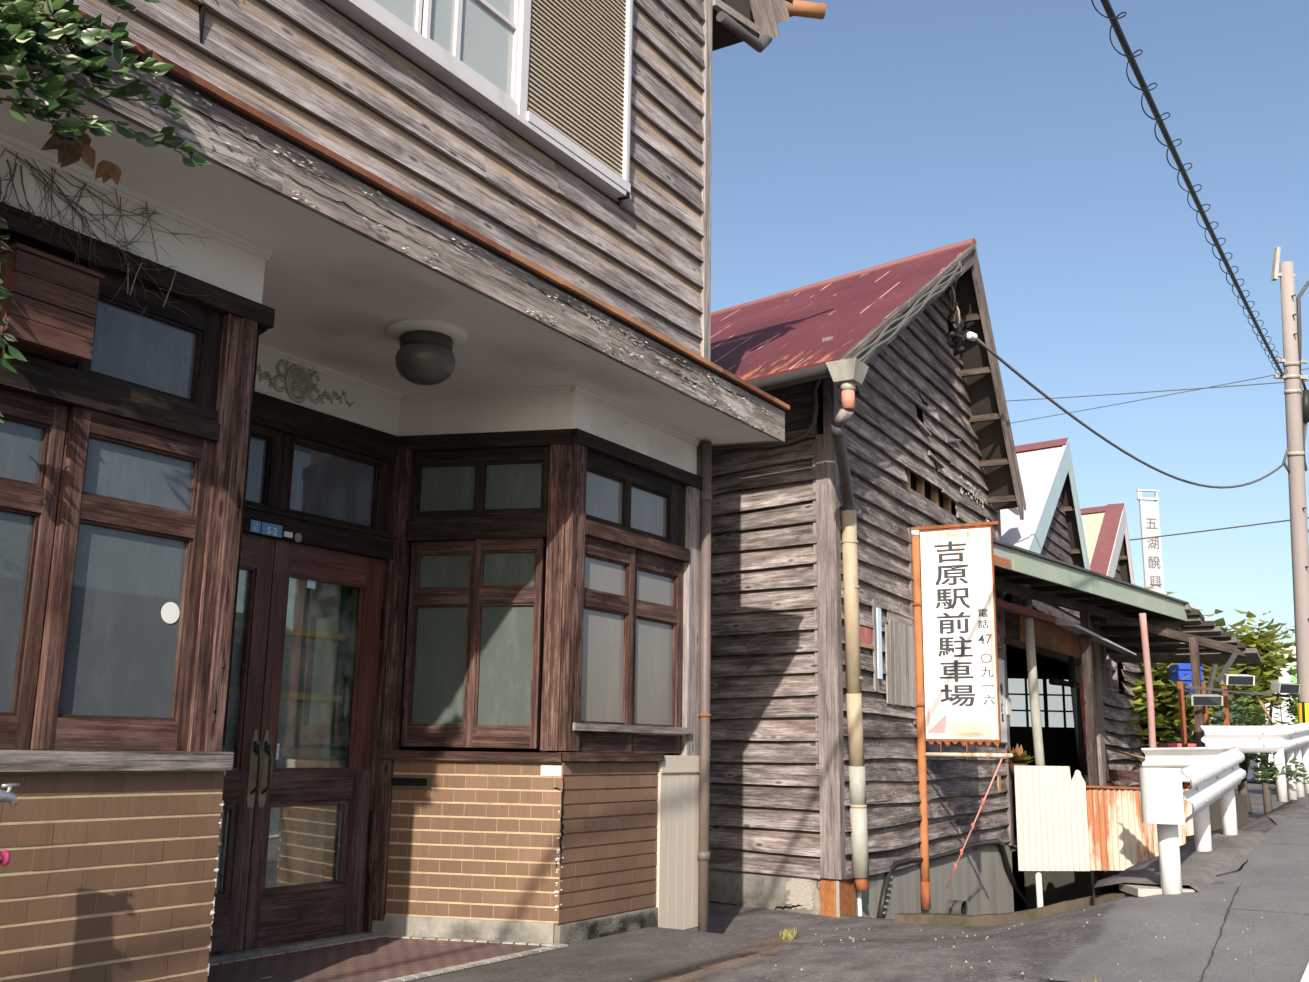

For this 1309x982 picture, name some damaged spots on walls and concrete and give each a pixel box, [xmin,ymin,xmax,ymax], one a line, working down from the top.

peeling [206,125,329,178]
peeling [525,294,648,361]
peeling [649,357,775,431]
crack [555,778,565,867]